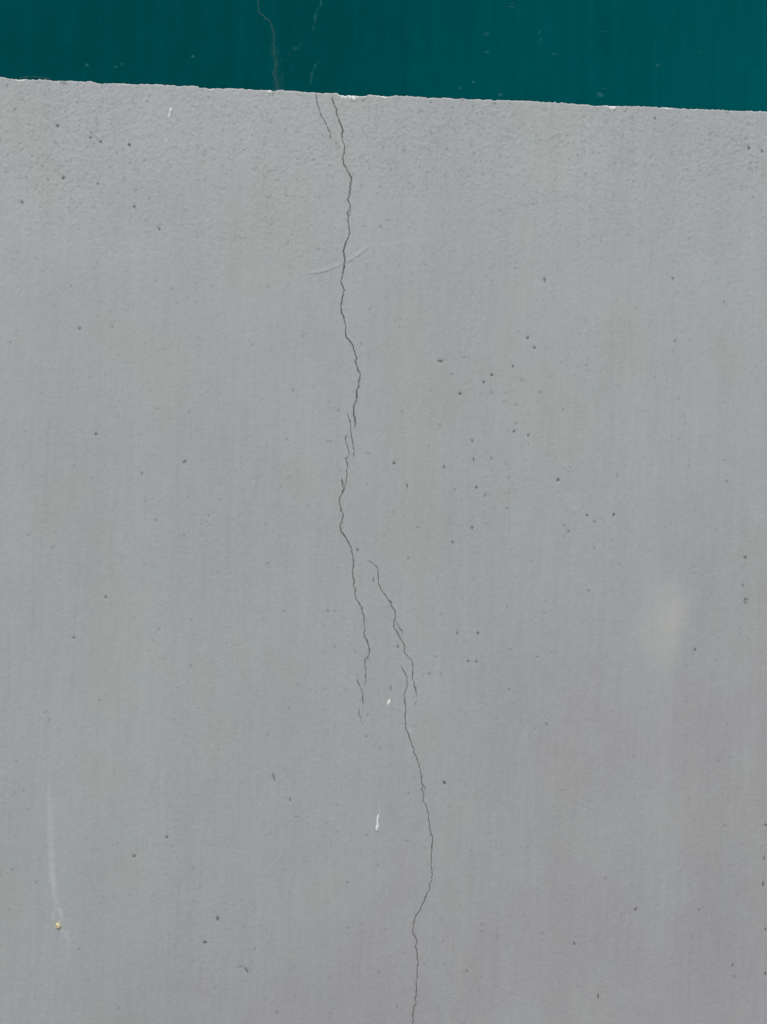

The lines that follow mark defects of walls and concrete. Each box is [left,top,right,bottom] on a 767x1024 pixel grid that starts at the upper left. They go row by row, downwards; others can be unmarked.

crack [315,93,433,1024]